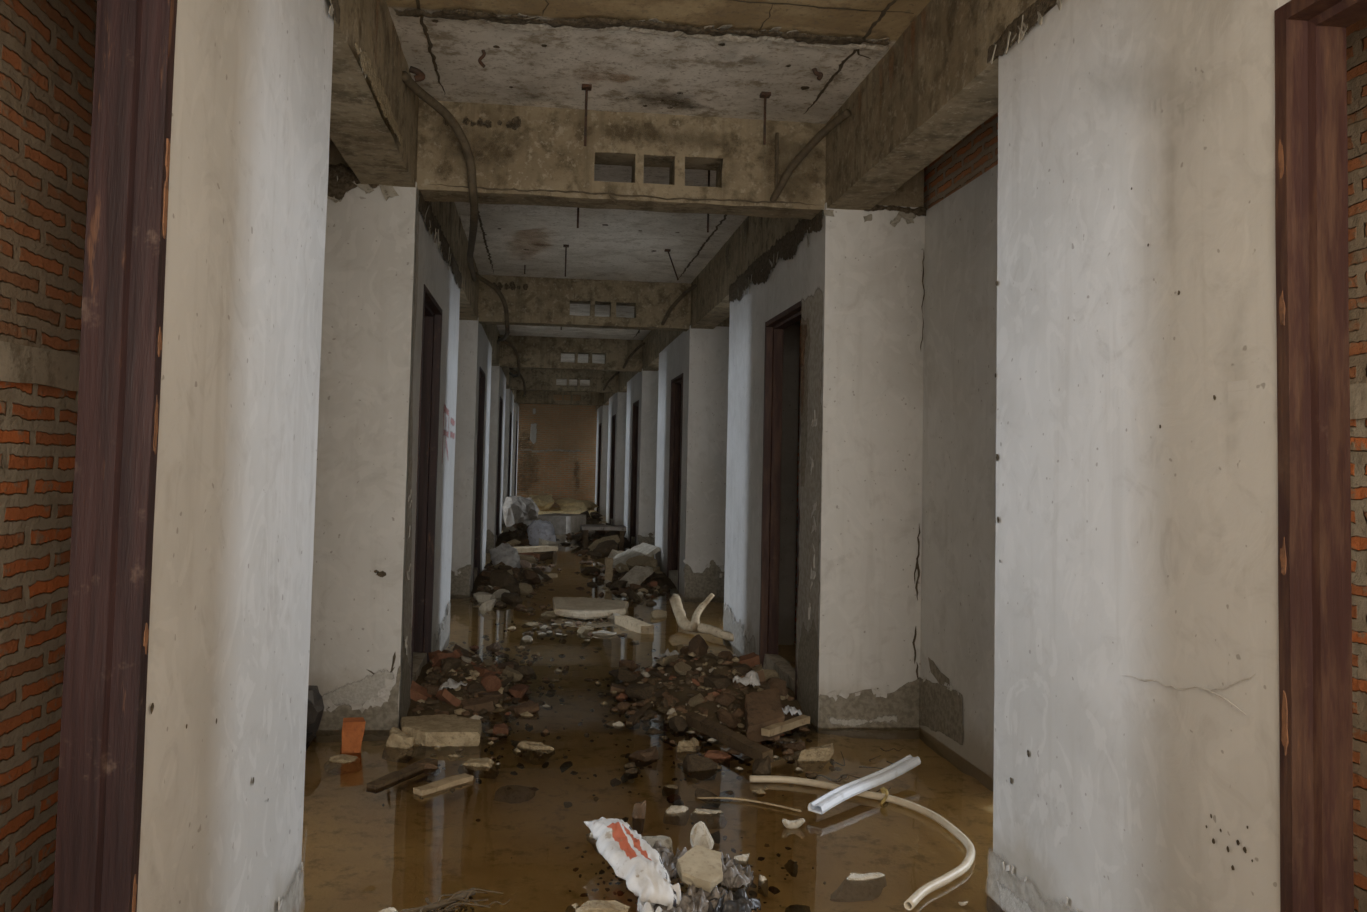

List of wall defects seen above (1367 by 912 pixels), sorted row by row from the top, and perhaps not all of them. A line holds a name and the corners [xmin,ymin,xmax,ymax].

crack [416,0,445,95]
crack [731,0,914,114]
spalling [987,0,1062,64]
spalling [327,163,399,203]
flaking render [316,190,462,737]
flaking render [796,288,963,745]
crack [912,526,920,679]
flaking render [277,862,305,912]
flaking render [986,851,1080,912]